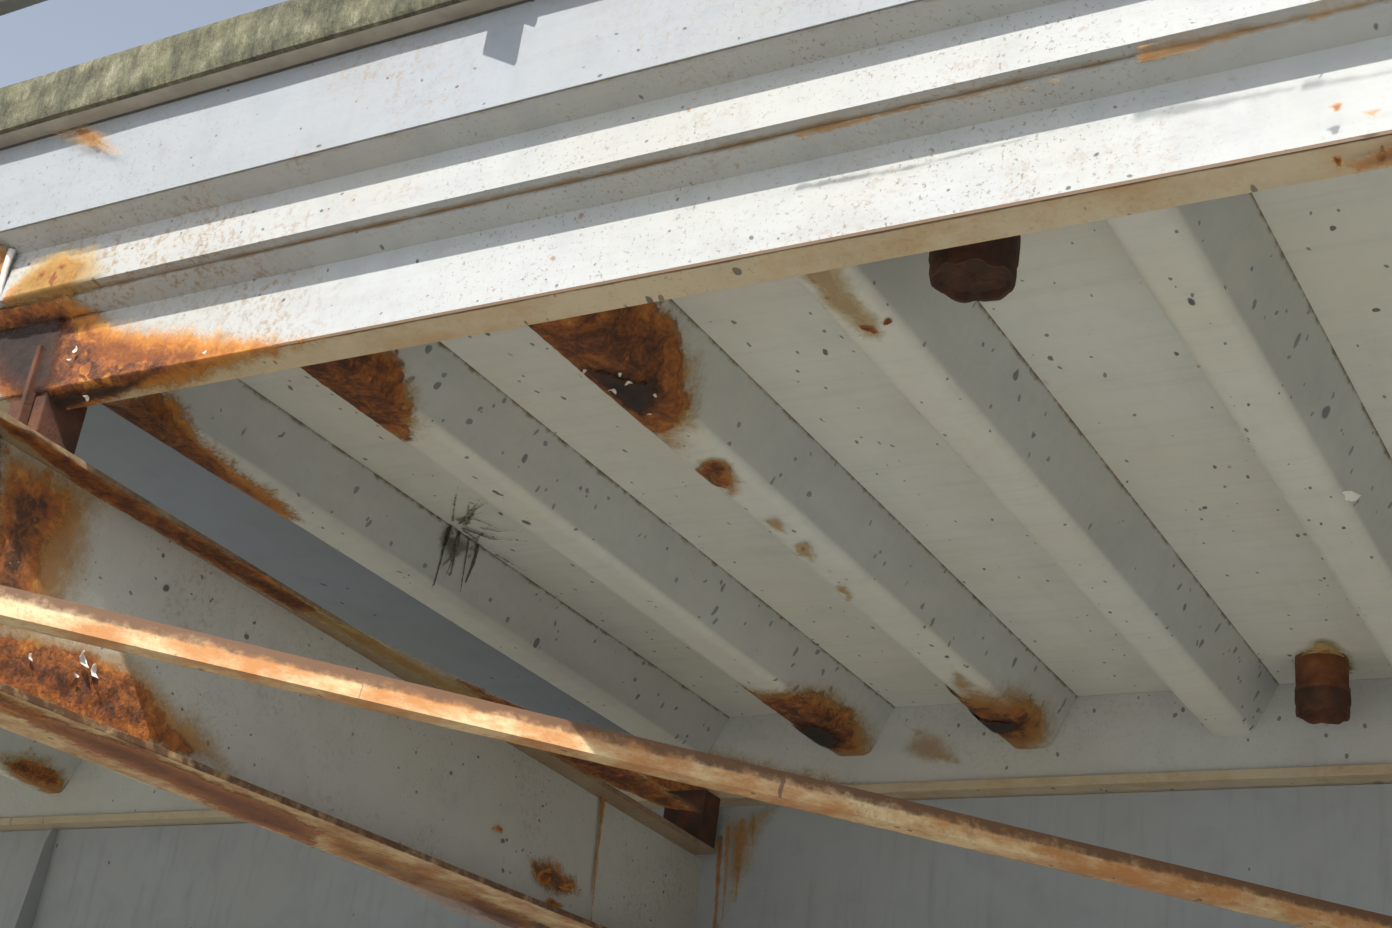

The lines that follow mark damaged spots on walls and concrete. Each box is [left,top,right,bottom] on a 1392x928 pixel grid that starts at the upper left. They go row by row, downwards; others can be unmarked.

corrosion [0,253,303,520]
corrosion [300,350,414,442]
corrosion [528,302,695,447]
corrosion [696,460,736,494]
corrosion [0,418,525,710]
corrosion [0,624,324,848]
corrosion [742,685,873,757]
corrosion [946,674,1048,749]
corrosion [463,895,548,928]
corrosion [532,858,576,908]
corrosion [549,752,711,921]
corrosion [713,813,763,928]